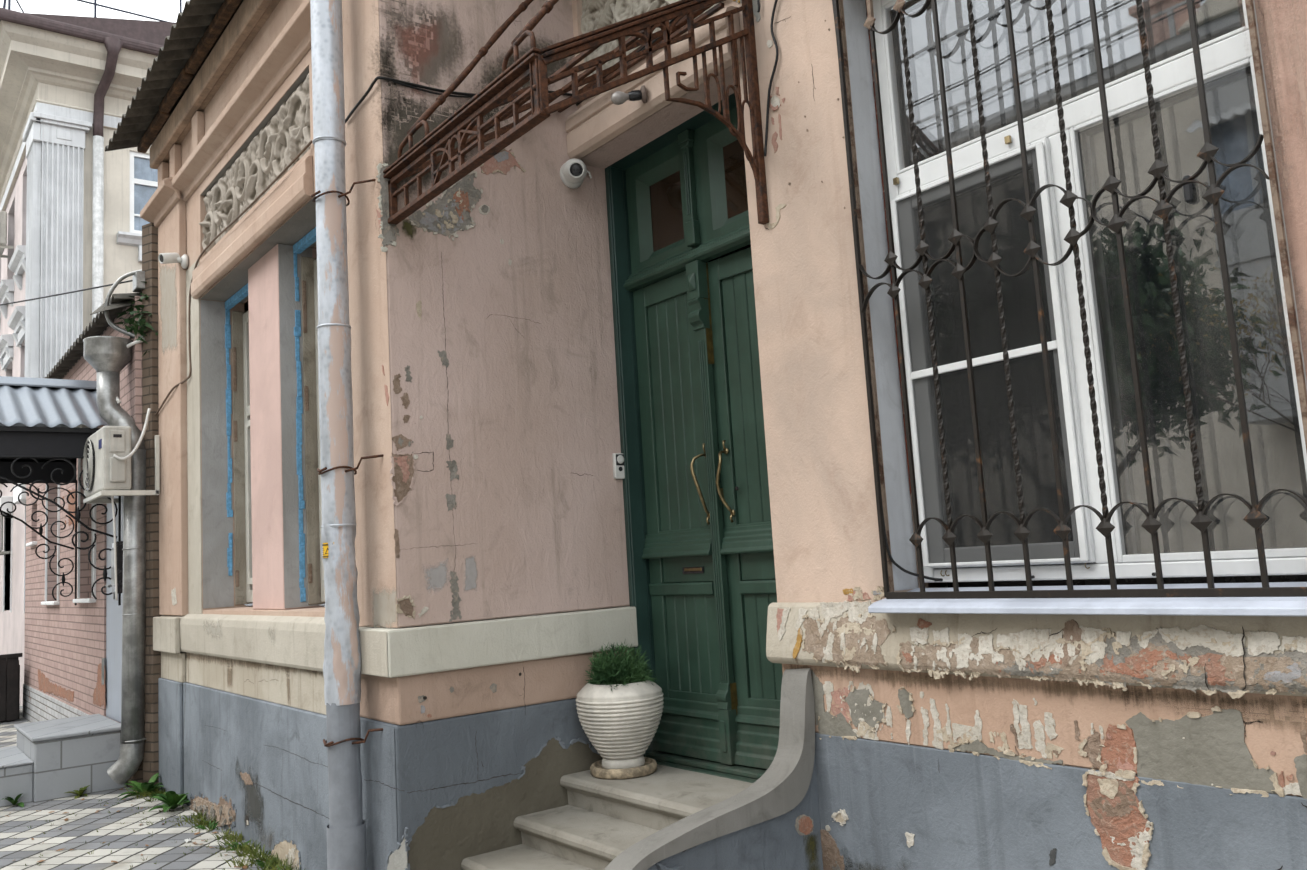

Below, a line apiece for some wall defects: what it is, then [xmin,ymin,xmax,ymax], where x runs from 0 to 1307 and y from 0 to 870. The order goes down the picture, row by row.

leakage [376,0,461,120]
peeling [376,148,526,252]
peeling [382,365,434,506]
peeling [776,586,1307,870]
flaking render [189,793,249,832]
flaking render [270,837,302,870]